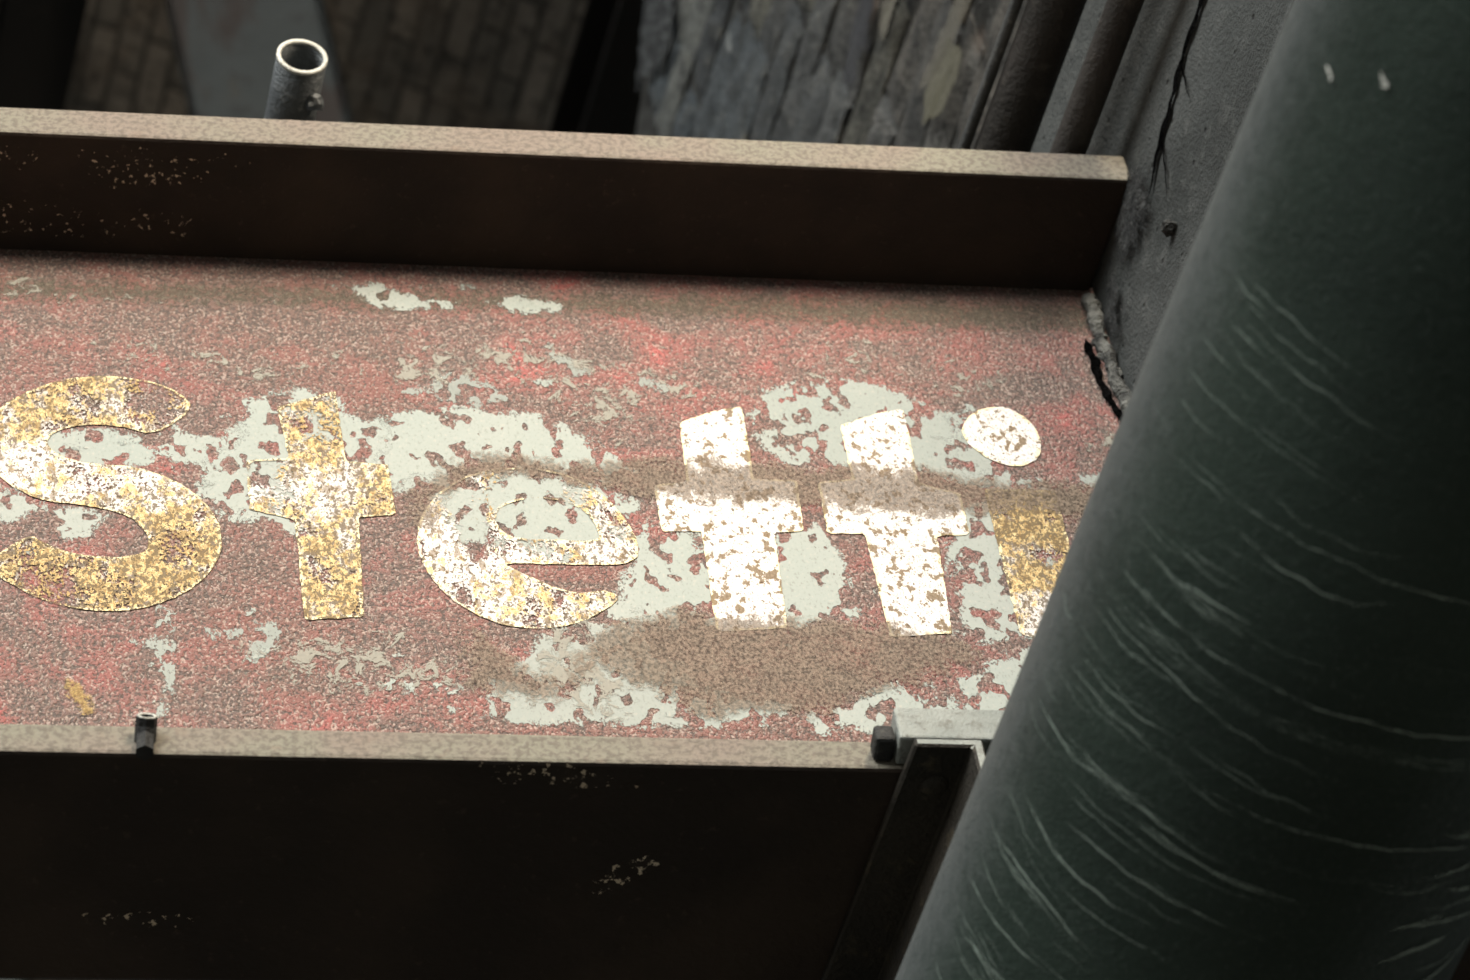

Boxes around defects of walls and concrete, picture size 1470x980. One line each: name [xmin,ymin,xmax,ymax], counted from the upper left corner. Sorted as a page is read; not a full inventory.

crack [1147,0,1204,212]
peeling [3,276,78,305]
spalling [1080,156,1178,414]
peeling [0,485,112,542]
peeling [42,281,1049,737]
corrosion [405,451,1095,530]
peeling [1066,473,1099,487]
corrosion [64,679,95,715]
corrosion [454,605,981,722]